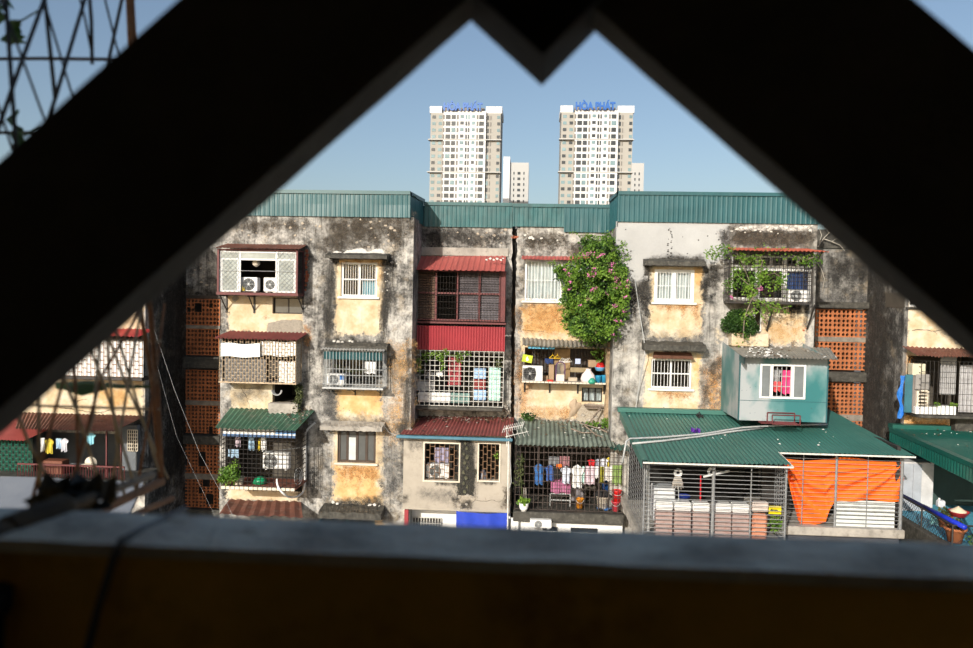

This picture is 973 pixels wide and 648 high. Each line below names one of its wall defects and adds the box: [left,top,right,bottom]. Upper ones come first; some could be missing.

mould [241,218,308,234]
damp [319,217,413,358]
damp [399,350,412,435]
damp [423,228,510,248]
crack [477,228,544,527]
damp [626,228,728,316]
damp [698,227,815,259]
damp [778,304,809,321]
damp [824,255,895,443]